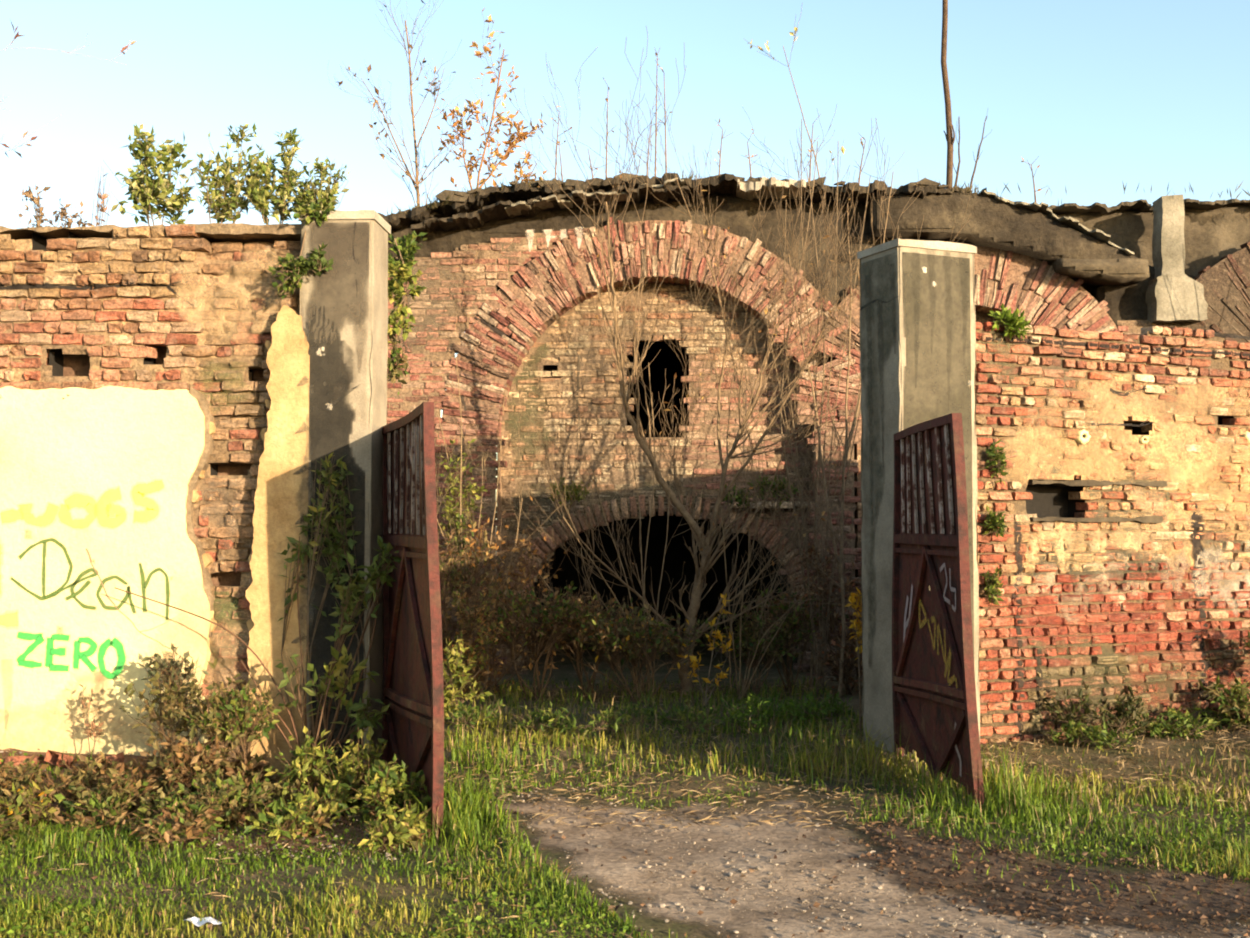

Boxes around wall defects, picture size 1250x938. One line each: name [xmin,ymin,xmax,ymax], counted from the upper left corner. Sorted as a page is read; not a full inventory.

spalling [32,232,48,250]
spalling [49,348,64,376]
spalling [143,346,156,365]
spalling [1132,422,1151,435]
peeling [186,388,238,637]
spalling [1026,479,1085,518]
peeling [246,305,324,783]
water stain [291,306,365,780]